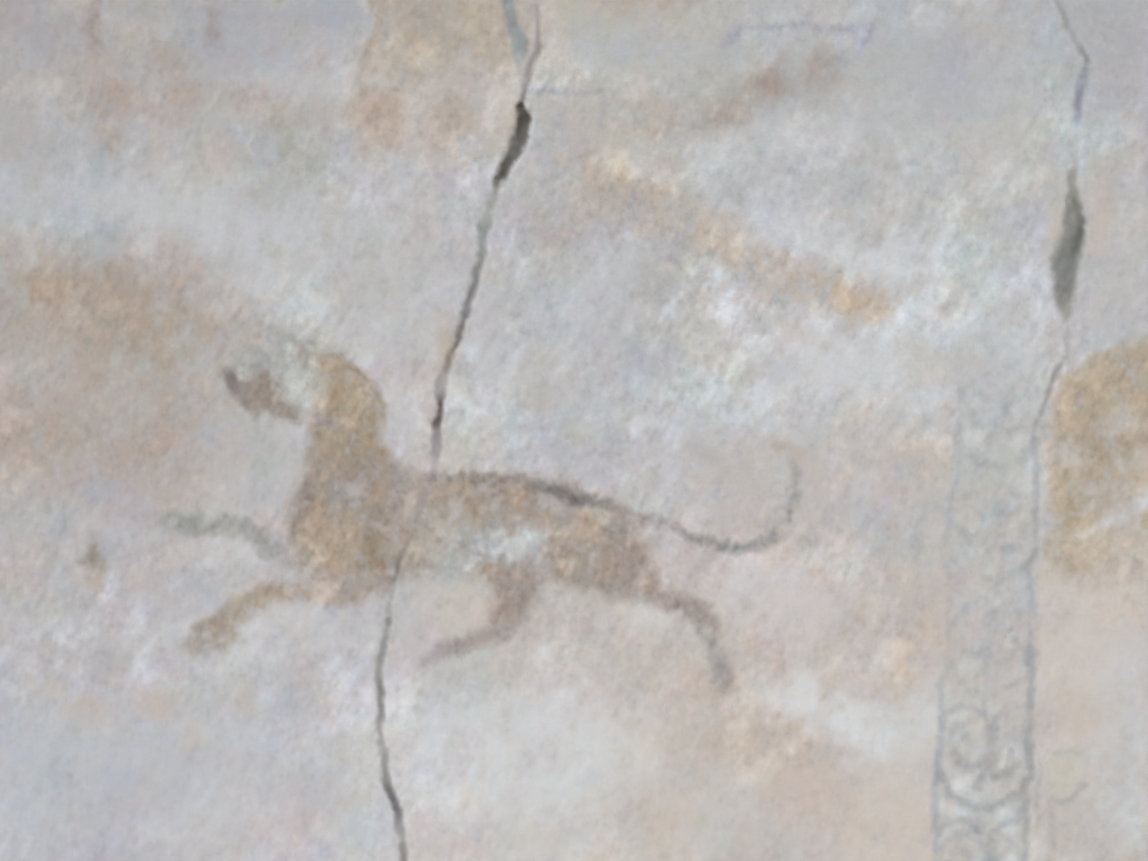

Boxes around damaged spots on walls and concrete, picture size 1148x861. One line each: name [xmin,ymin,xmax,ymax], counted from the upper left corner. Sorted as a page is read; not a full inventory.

crack [371,0,546,861]
crack [1027,0,1092,492]